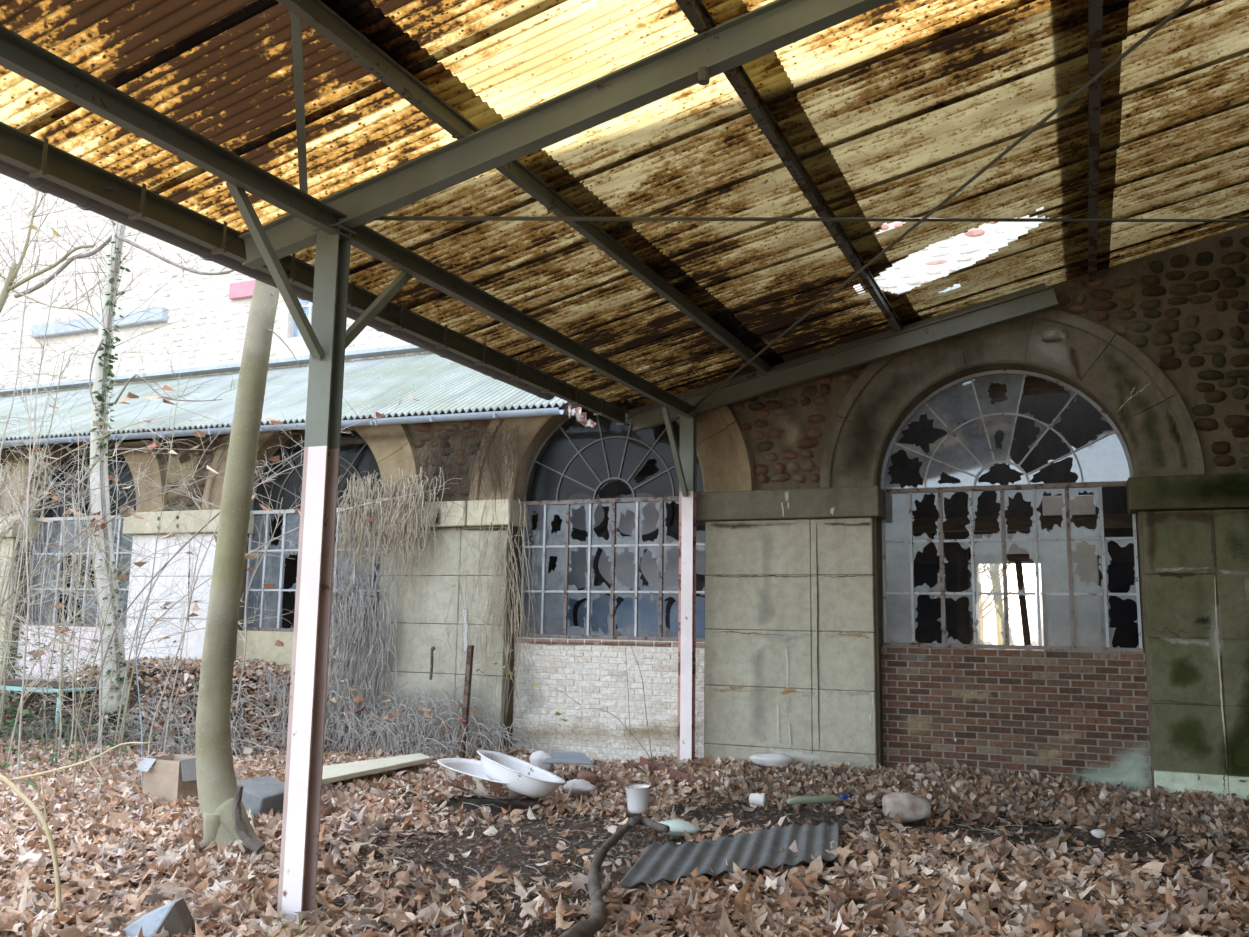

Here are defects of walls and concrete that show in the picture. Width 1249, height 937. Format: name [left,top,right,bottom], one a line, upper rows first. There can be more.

damp [1173,660,1197,684]
damp [1226,699,1249,775]